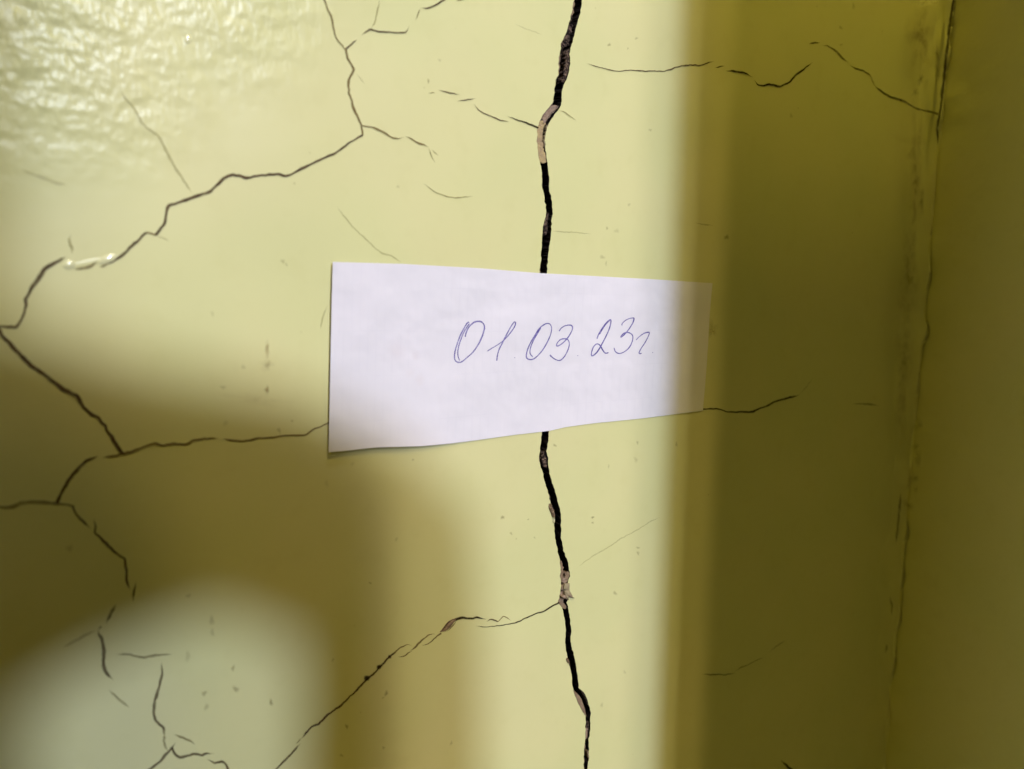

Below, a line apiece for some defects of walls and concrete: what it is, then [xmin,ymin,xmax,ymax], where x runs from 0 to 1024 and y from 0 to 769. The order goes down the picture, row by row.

crack [431,0,954,273]
crack [0,0,461,678]
crack [150,667,229,769]
crack [276,431,591,769]